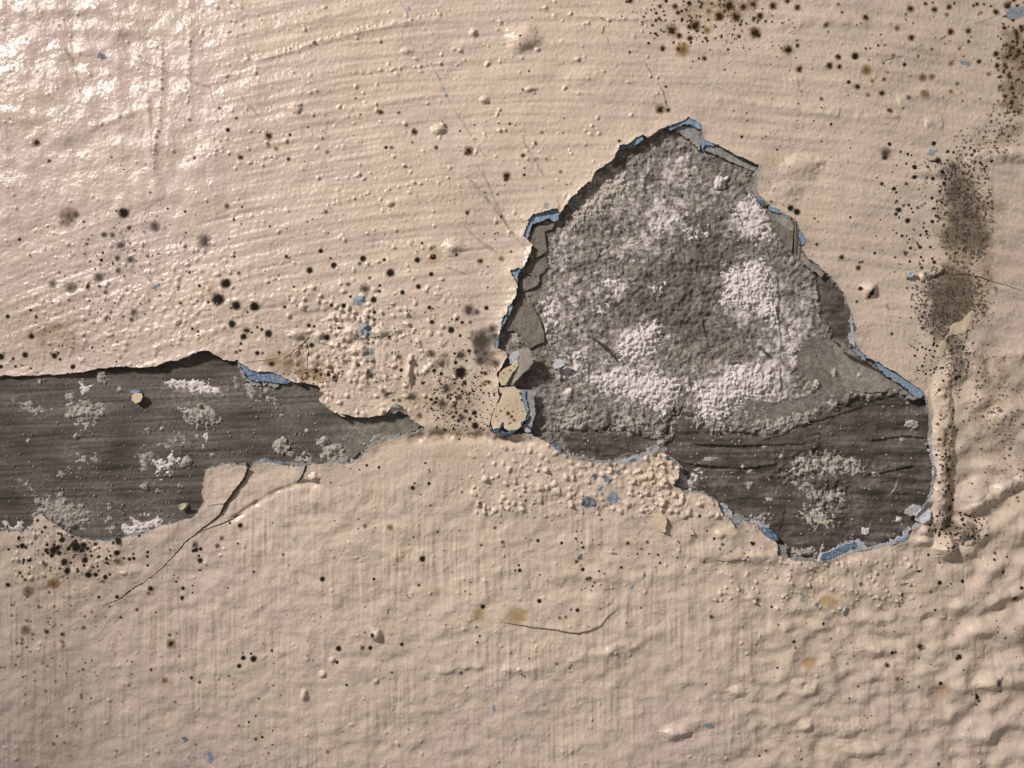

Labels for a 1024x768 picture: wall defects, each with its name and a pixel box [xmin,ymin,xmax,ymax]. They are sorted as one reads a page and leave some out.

water stain [621,0,810,75]
water stain [0,208,197,373]
water stain [176,272,284,366]
peeling [490,117,936,562]
water stain [825,0,1024,563]
peeling [0,350,424,542]
water stain [0,519,149,698]
crack [105,468,249,605]